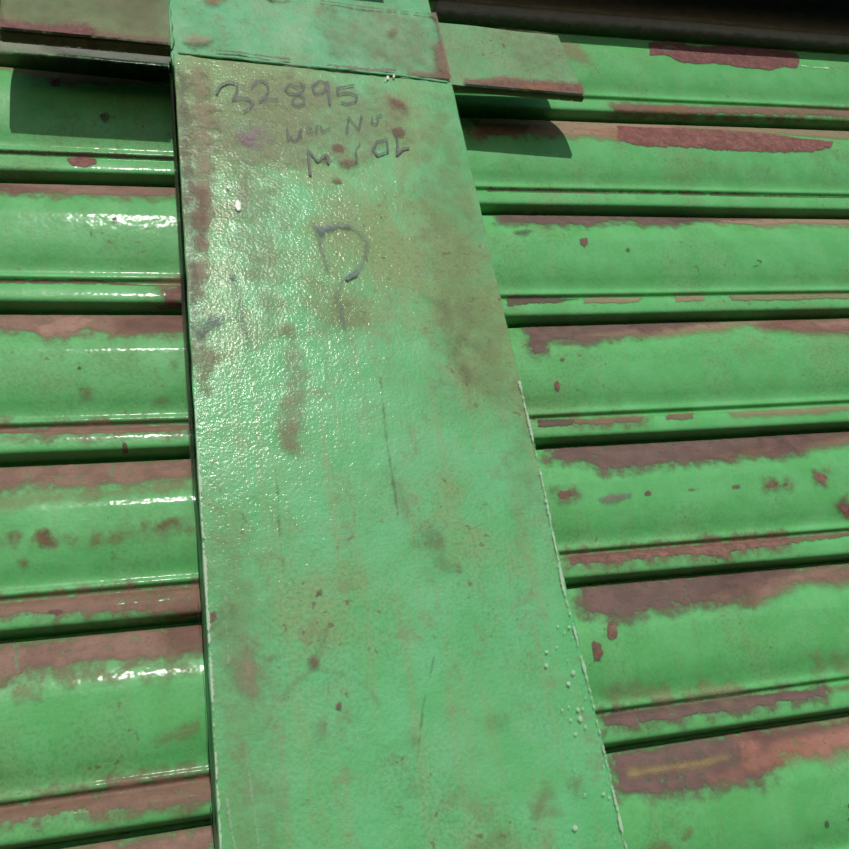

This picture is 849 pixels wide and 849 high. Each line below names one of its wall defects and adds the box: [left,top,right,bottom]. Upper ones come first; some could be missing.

peeling [649,41,828,70]
peeling [617,125,849,152]
peeling [67,156,96,167]